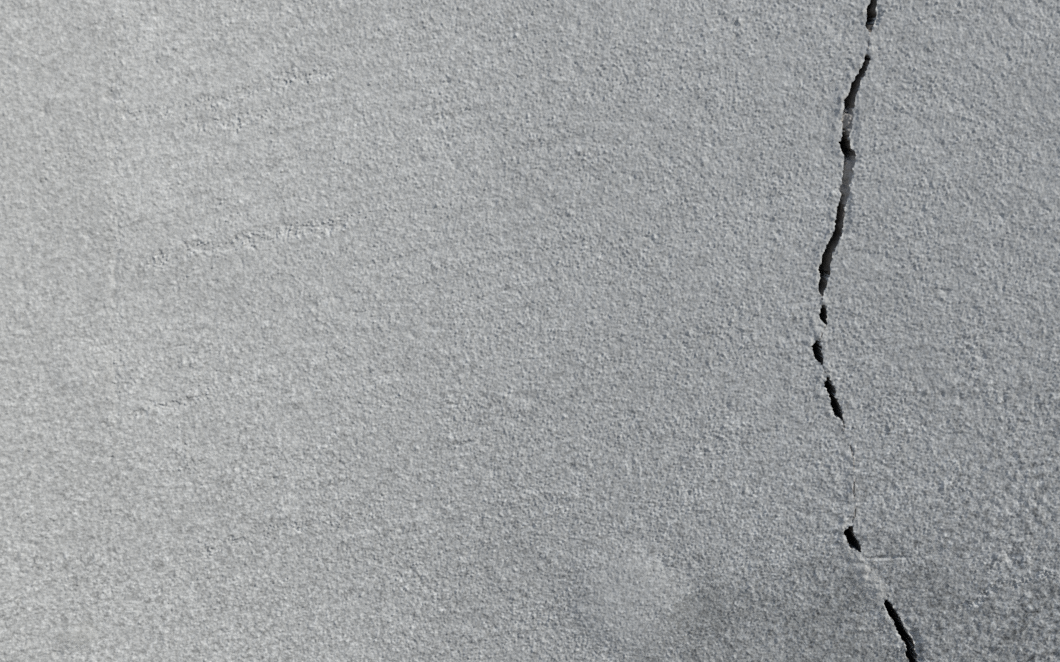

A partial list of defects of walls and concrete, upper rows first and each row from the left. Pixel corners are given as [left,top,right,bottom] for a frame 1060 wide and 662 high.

crack [811,0,917,662]